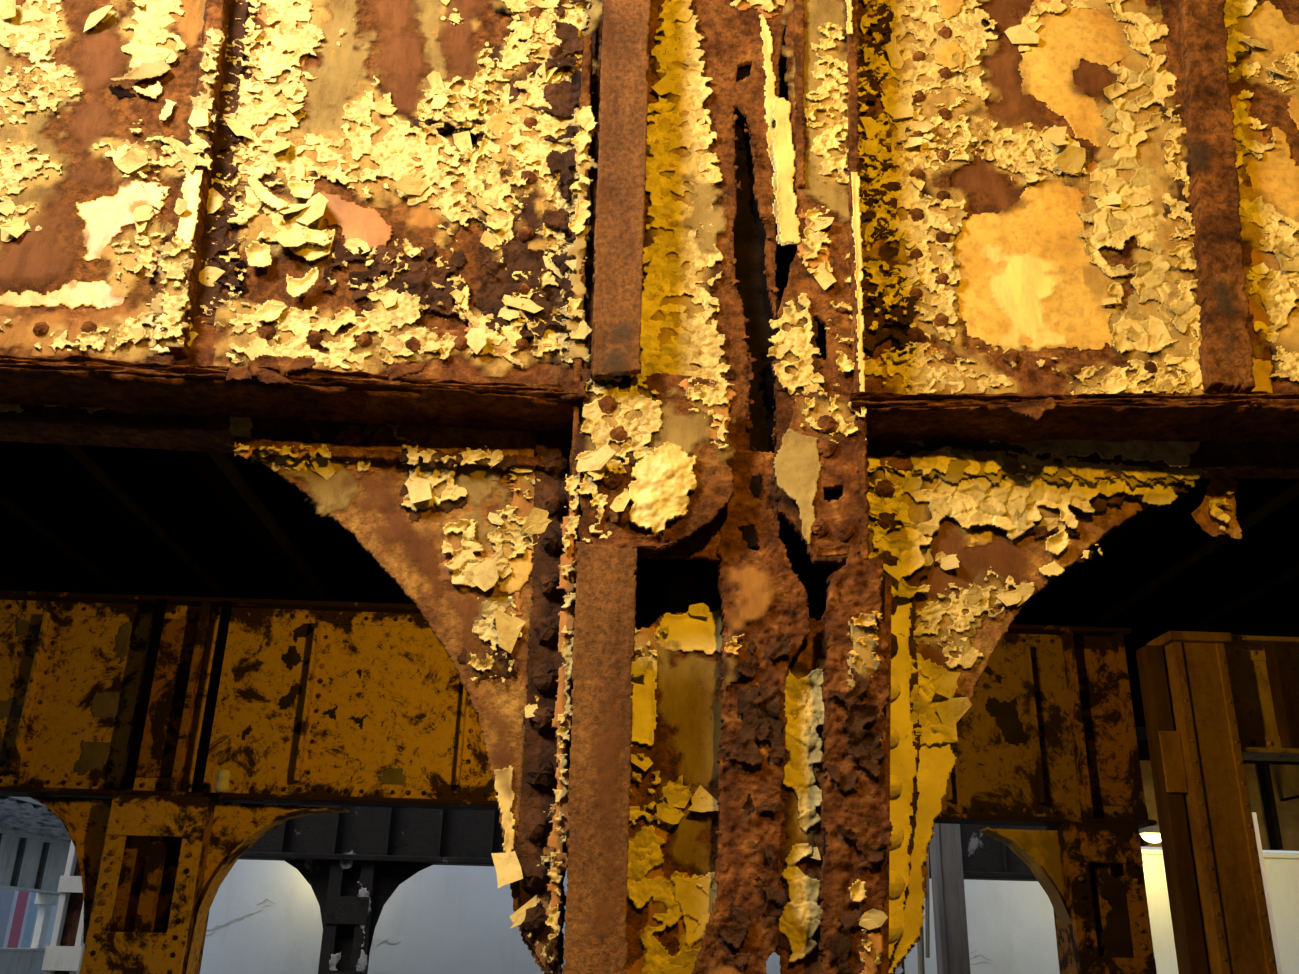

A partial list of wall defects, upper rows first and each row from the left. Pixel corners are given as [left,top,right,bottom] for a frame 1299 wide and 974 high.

rust [856,0,917,375]
peeling [1223,0,1299,394]
rust [226,354,316,385]
peeling [0,0,737,974]
rust [345,469,440,582]
peeling [730,0,1242,974]
rust [1008,397,1056,421]
rust [453,598,480,645]
rust [719,566,792,766]
rust [827,611,885,793]
rust [714,876,786,974]
rust [830,909,884,974]